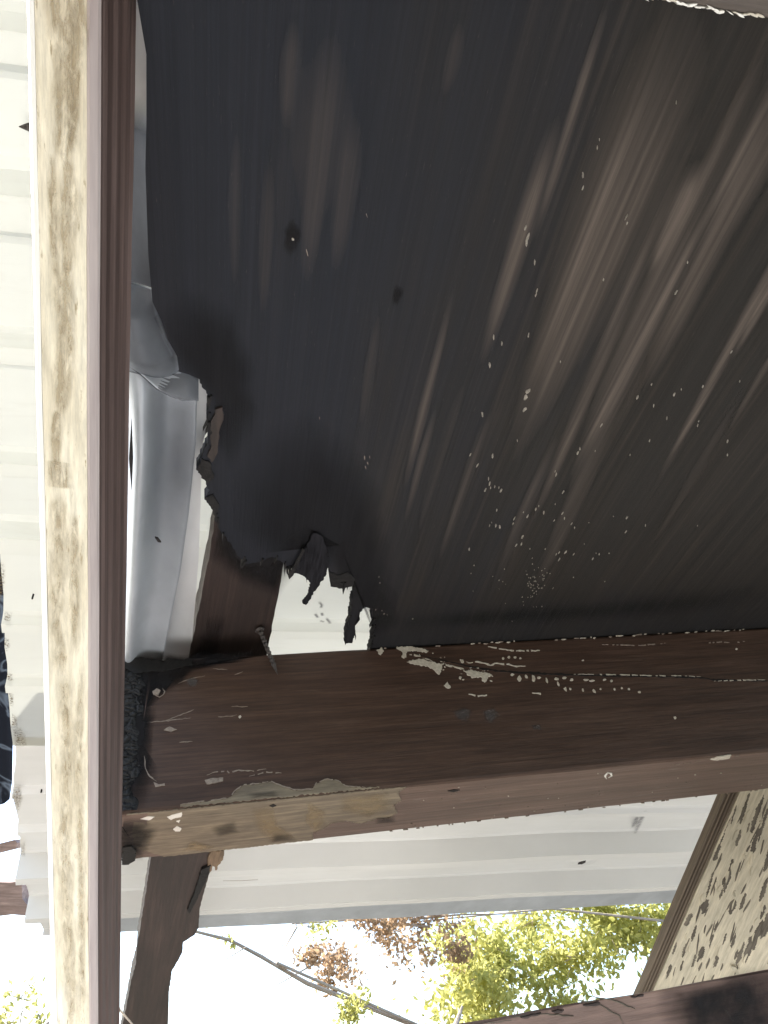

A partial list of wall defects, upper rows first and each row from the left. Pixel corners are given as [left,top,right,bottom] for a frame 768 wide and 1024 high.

peeling [196,458,219,516]
peeling [329,571,355,589]
peeling [555,632,672,646]
peeling [377,640,641,697]
peeling [127,769,424,857]
peeling [666,785,768,985]